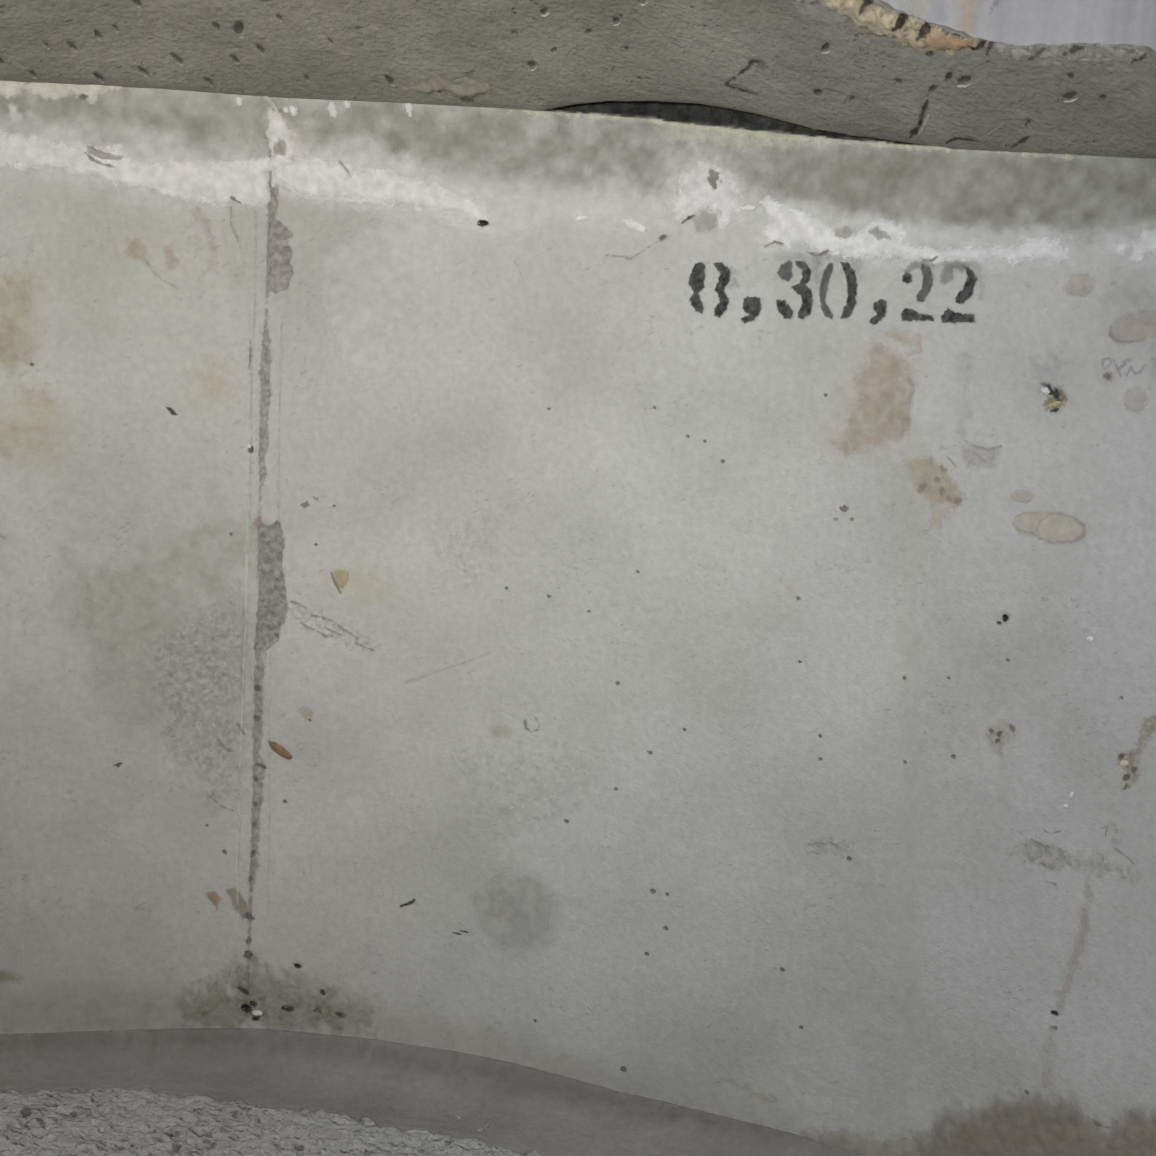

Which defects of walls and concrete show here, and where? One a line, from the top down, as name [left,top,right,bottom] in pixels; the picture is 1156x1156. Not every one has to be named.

spalling [928,72,971,91]
spalling [798,0,1151,78]
leakage [0,81,1156,266]
leakage [835,329,921,454]
crack [209,150,294,1016]